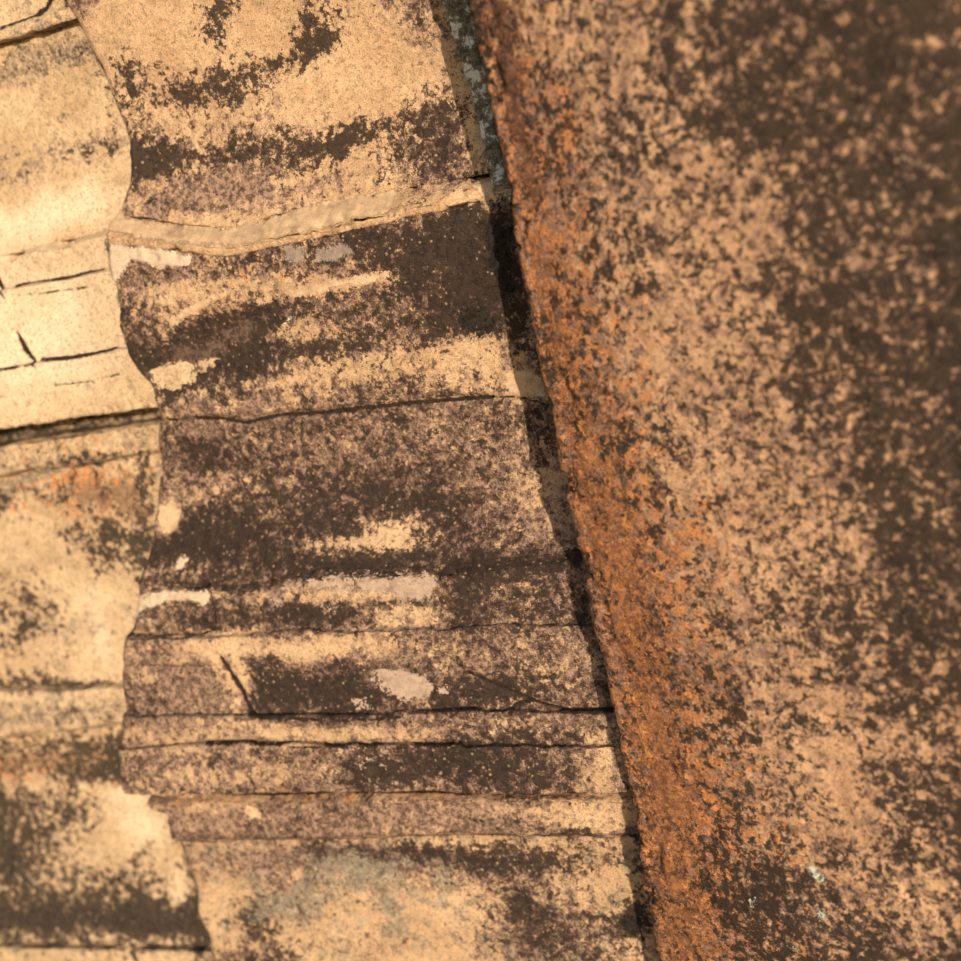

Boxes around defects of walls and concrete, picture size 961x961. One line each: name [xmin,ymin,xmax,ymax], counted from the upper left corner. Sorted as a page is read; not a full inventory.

damp [127,182,249,219]
spalling [105,191,403,281]
damp [479,198,517,297]
crack [15,268,104,296]
damp [452,298,506,340]
crack [0,346,120,386]
rust [473,0,726,961]
spalling [135,585,210,618]
spalling [266,569,440,612]
crack [150,656,479,750]
spalling [369,664,451,706]
crack [433,652,614,716]